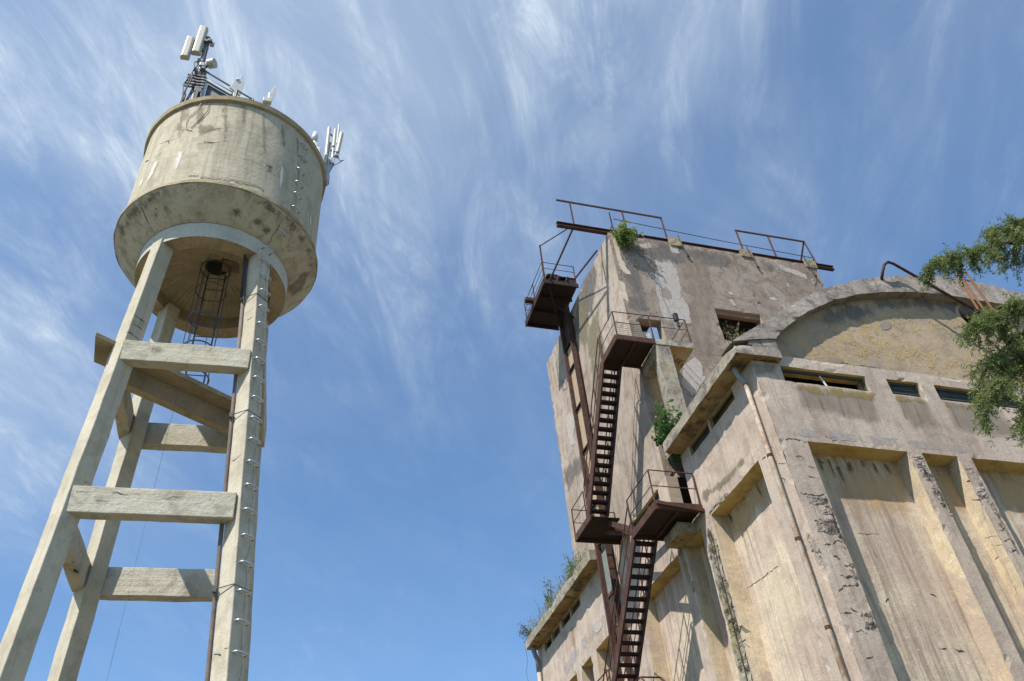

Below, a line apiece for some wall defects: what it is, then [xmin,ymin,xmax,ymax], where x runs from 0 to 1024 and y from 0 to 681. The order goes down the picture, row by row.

flaking render [638,242,692,324]
water stain [824,299,974,323]
water stain [818,459,905,507]
spalling [910,453,953,516]
spalling [806,494,846,566]
spalling [861,610,876,629]